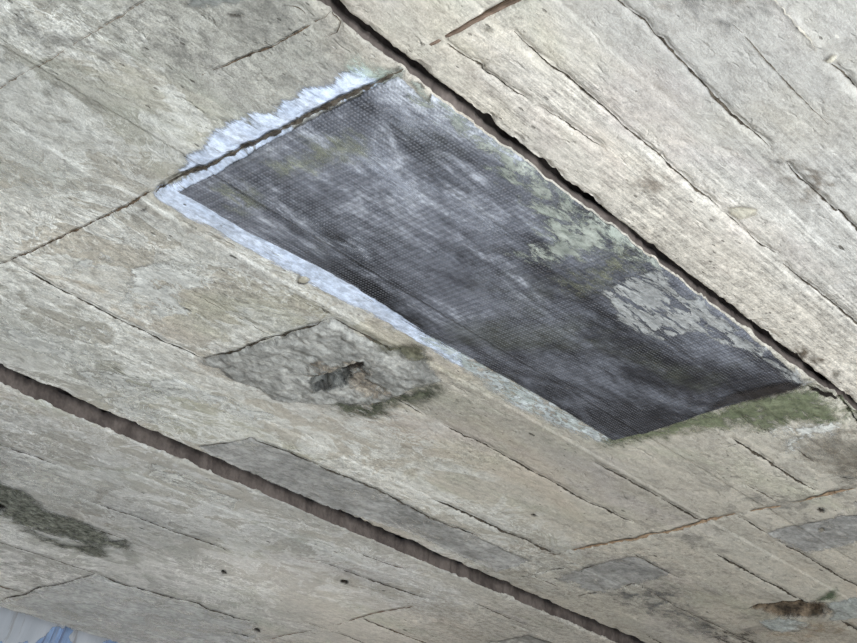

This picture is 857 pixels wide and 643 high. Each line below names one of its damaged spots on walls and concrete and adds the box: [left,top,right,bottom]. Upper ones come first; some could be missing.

crack [204,5,341,74]
spalling [305,361,391,399]
crack [1,573,95,601]
spalling [751,600,832,617]